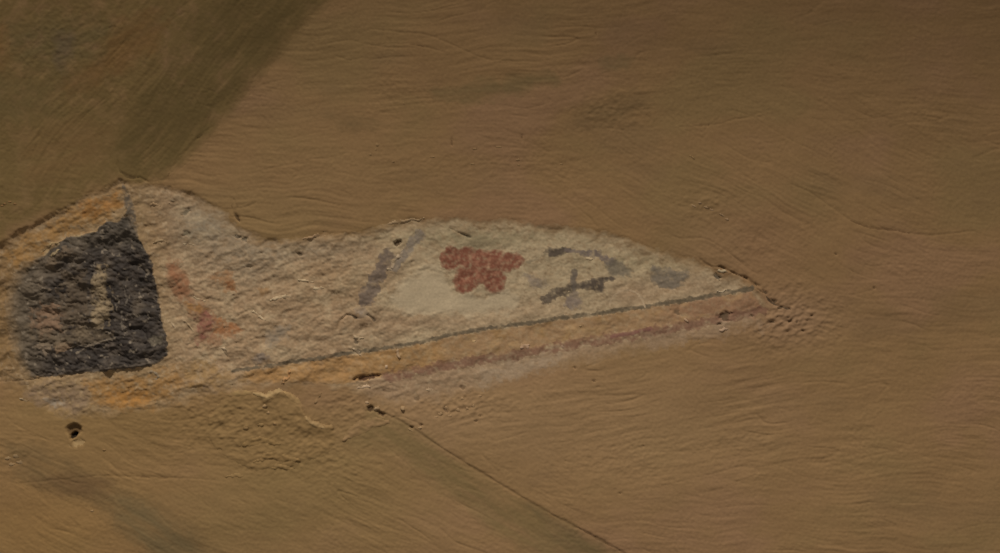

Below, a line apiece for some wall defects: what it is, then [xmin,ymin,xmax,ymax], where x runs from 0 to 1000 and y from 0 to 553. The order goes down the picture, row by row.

peeling [23,242,128,357]
spalling [353,365,388,389]